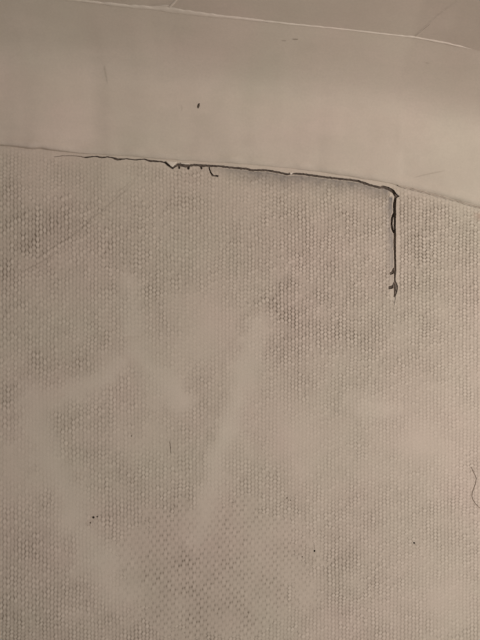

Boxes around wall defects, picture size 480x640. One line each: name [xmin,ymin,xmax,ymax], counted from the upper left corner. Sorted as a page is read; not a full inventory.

crack [55,155,480,305]